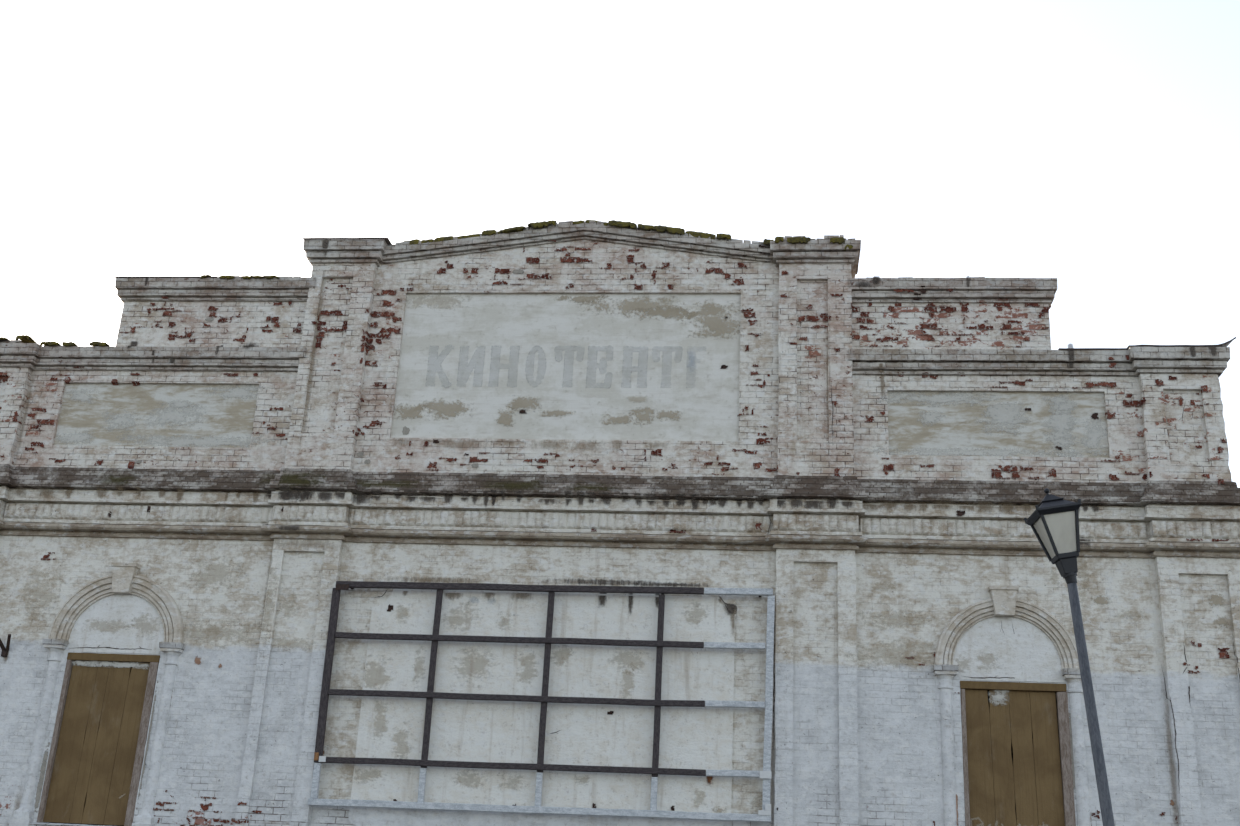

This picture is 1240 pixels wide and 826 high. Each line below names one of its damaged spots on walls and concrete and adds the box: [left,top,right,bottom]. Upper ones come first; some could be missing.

spalling [120,293,349,349]
spalling [360,284,414,367]
spalling [0,407,69,463]
leakage [225,486,522,506]
leakage [541,491,1030,512]
spalling [153,790,262,826]